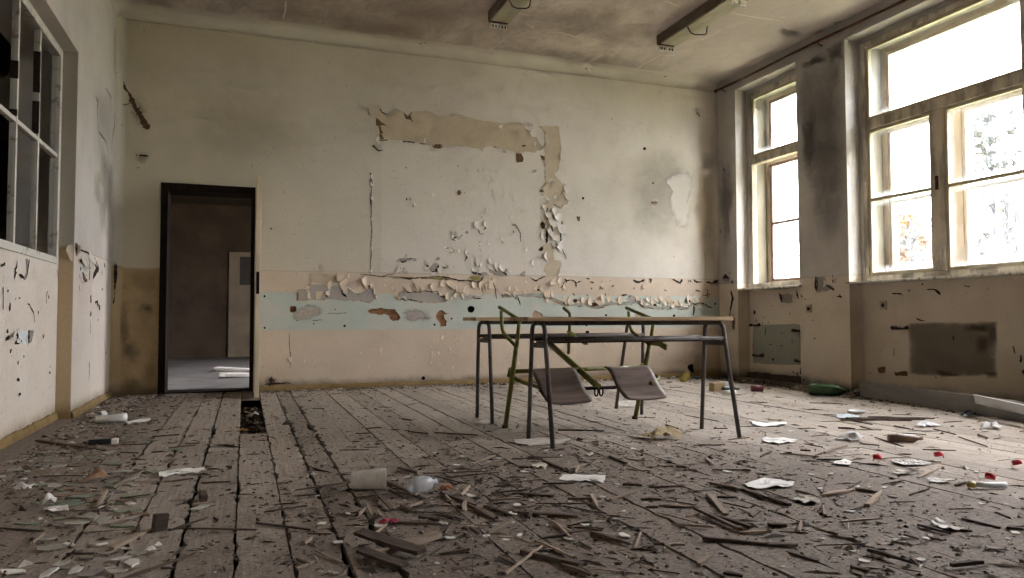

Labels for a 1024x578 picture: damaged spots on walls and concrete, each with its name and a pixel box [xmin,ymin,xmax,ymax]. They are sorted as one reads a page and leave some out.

peeling [290,107,712,369]
peeling [66,244,105,289]
peeling [815,275,836,293]
peeling [6,328,44,365]
peeling [752,324,801,375]